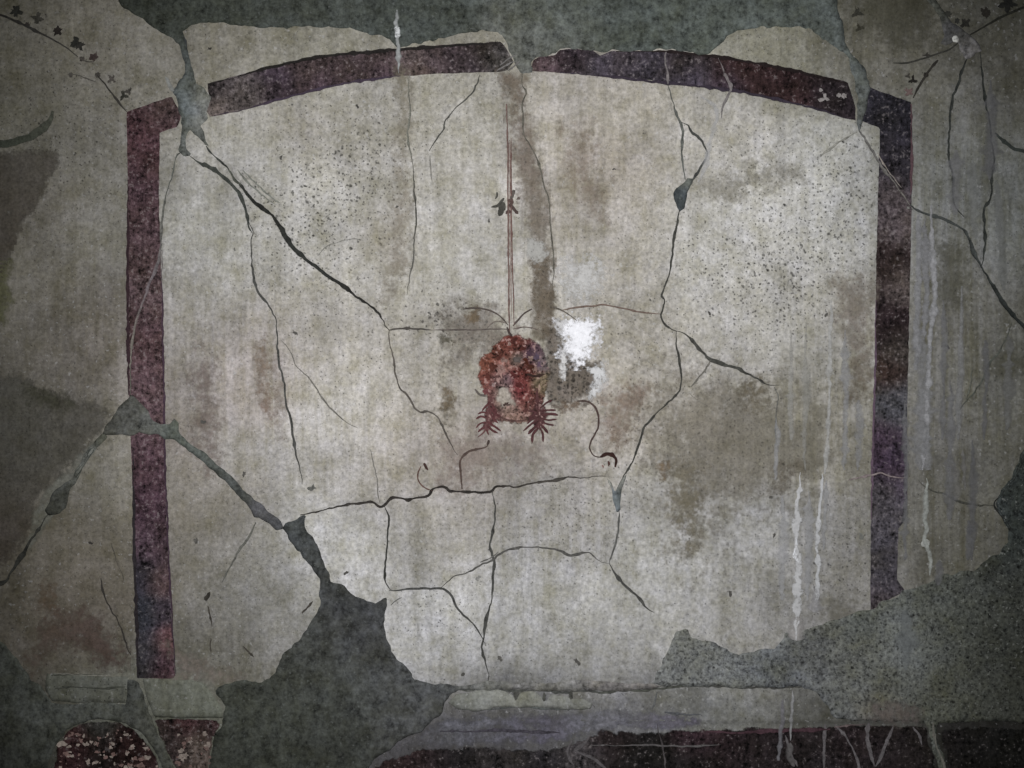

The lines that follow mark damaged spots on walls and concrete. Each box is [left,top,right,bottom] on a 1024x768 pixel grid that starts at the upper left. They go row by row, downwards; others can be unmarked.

crack [129,146,458,479]
crack [406,75,480,292]
crack [521,80,555,285]
leakage [503,75,607,410]
crack [664,52,708,186]
crack [718,58,733,117]
crack [820,54,1024,416]
crack [0,516,47,586]
crack [204,522,256,652]
crack [300,209,802,768]
leakage [641,278,873,641]
crack [849,455,1024,535]